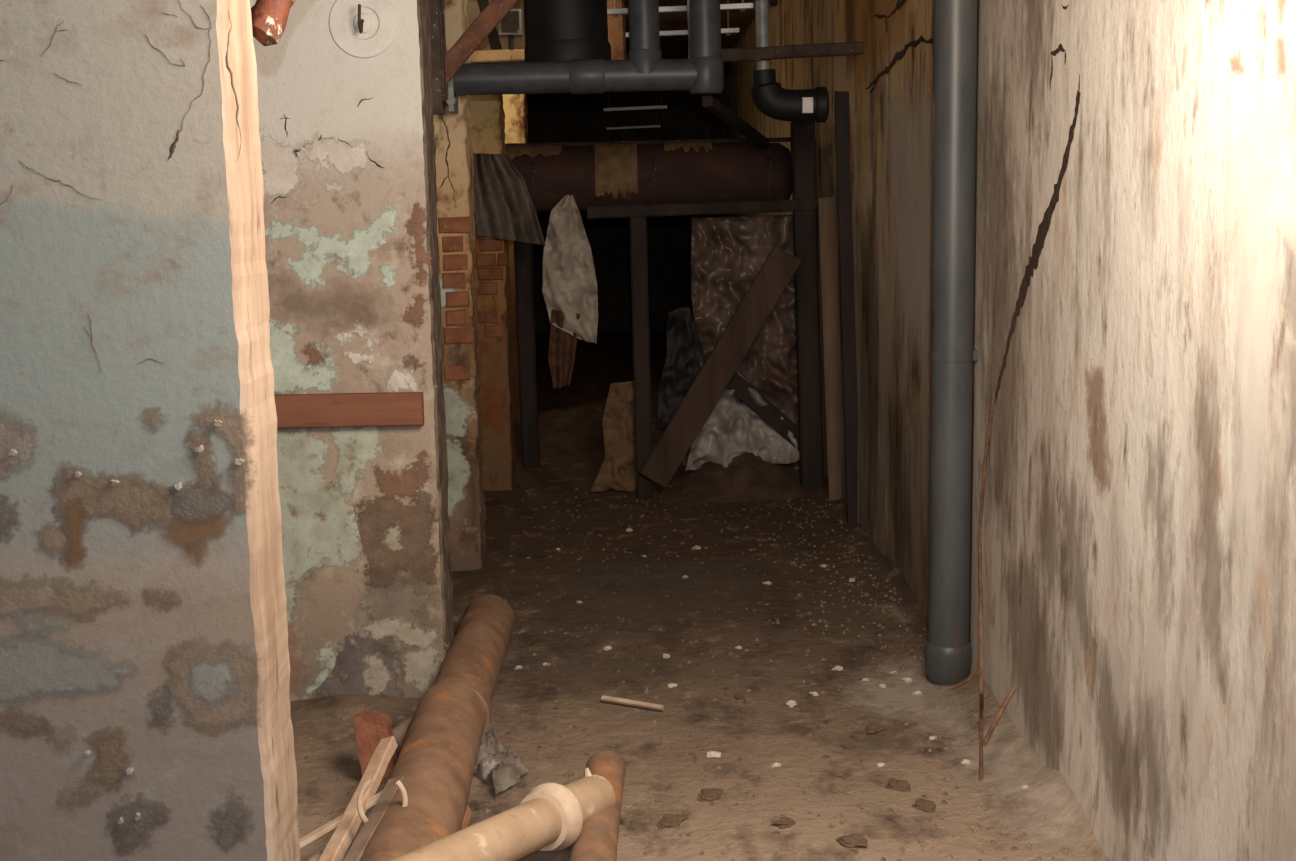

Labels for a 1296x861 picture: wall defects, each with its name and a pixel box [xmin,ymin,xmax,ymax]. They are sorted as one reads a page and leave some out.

crack [145,0,242,162]
crack [865,0,933,93]
crack [0,160,102,205]
crack [995,43,1080,403]
peeling [269,316,382,394]
peeling [386,355,426,392]
water stain [1227,129,1270,561]
peeling [36,403,254,563]
peeling [277,365,474,698]
spalling [354,712,397,784]
water stain [1108,627,1127,726]
water stain [1186,638,1204,802]